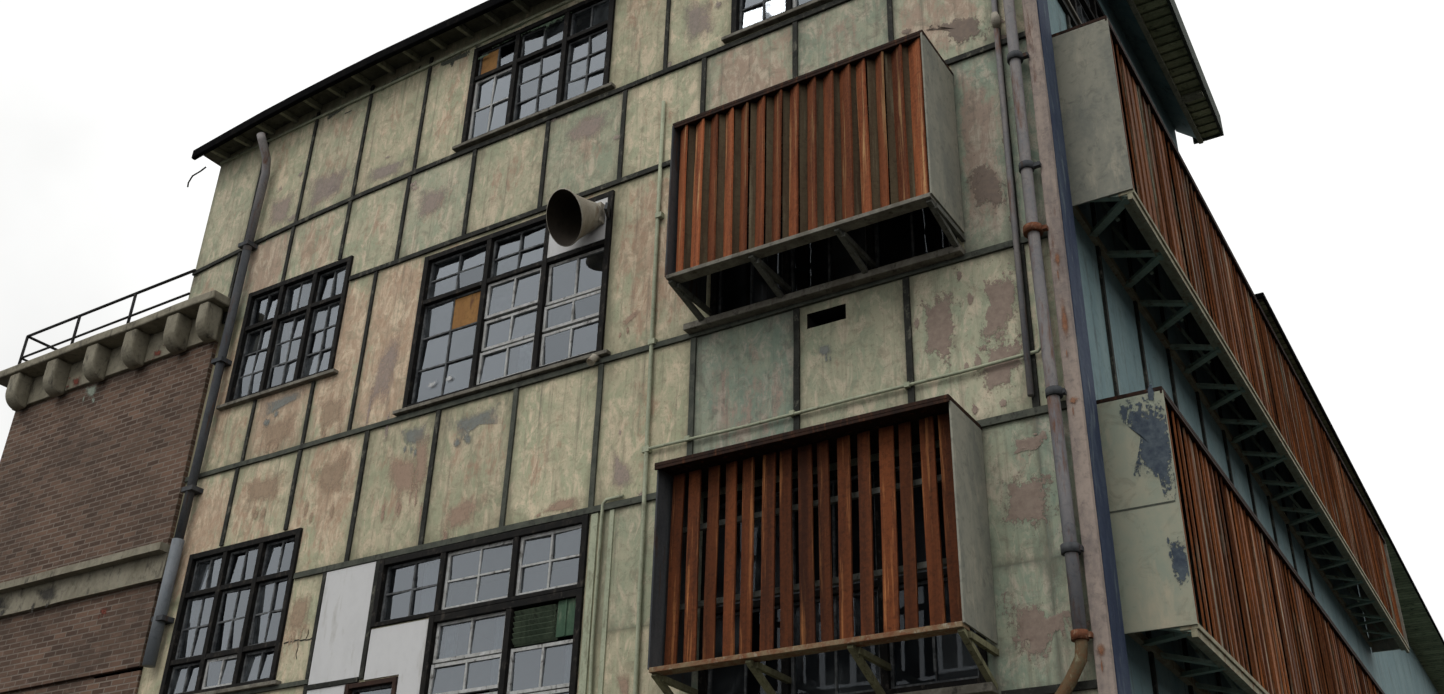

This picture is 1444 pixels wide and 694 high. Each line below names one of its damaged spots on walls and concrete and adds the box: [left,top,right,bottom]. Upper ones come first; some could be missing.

peeling [914,263,1024,407]
peeling [1119,385,1176,499]
peeling [1167,537,1190,585]